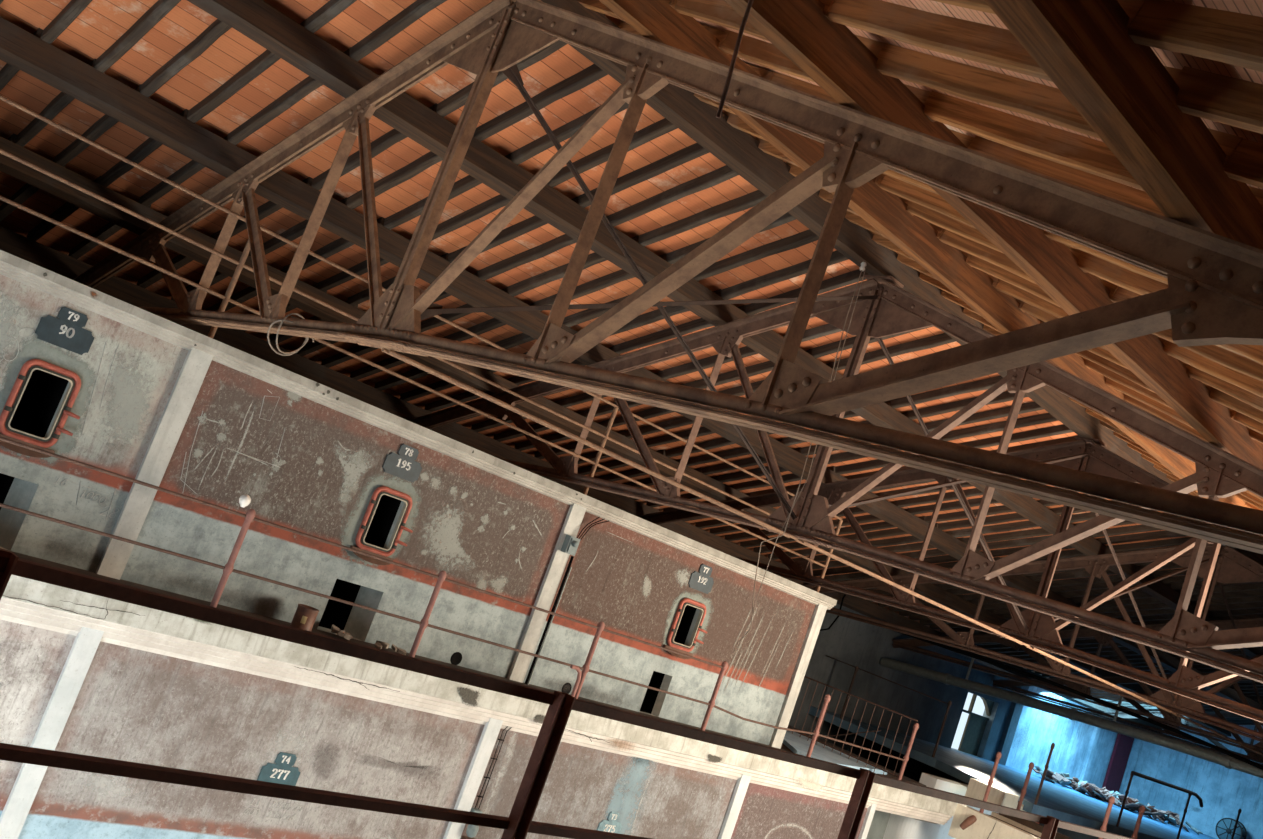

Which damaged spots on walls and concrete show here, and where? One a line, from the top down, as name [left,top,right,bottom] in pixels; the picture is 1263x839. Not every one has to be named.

peeling [420,472,489,571]
peeling [476,577,508,593]
water stain [607,758,649,835]